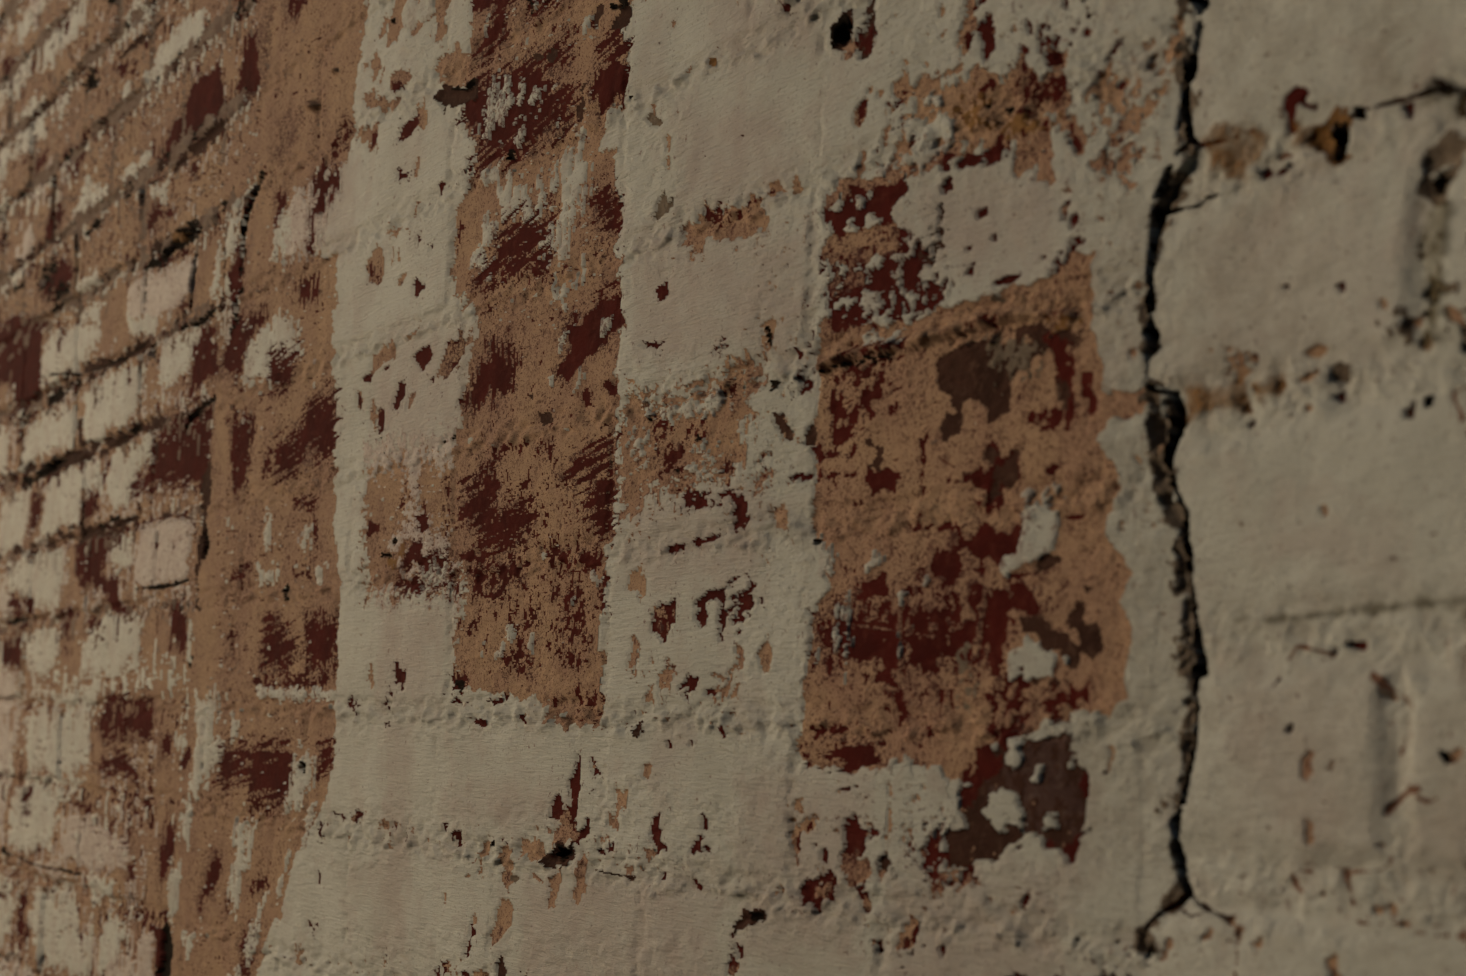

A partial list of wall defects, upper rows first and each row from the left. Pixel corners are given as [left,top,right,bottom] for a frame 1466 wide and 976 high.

crack [1350,84,1455,120]
spalling [1416,129,1466,208]
peeling [1210,345,1261,430]
peeling [1277,343,1352,403]
peeling [1405,395,1435,419]
peeling [0,0,804,976]
peeling [772,0,1186,914]
crack [1132,0,1254,976]
peeling [863,906,927,969]
peeling [1011,893,1054,921]
peeling [1326,953,1342,976]